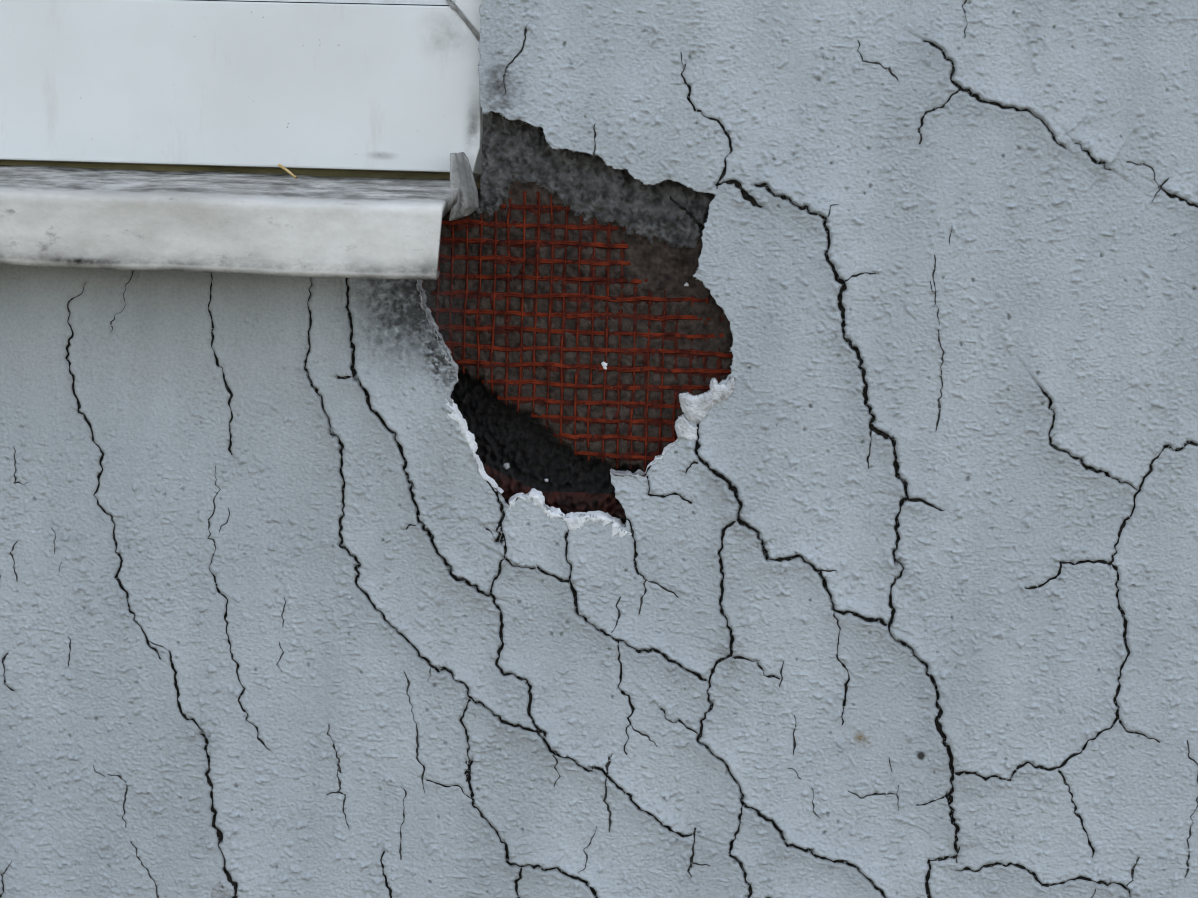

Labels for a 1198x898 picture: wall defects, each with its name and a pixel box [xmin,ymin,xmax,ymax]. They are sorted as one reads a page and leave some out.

crack [503,25,527,96]
crack [857,40,898,81]
crack [918,0,1198,208]
crack [110,270,134,332]
flaking render [416,112,735,538]
crack [13,447,28,485]
crack [208,274,270,750]
crack [304,53,1198,898]
crack [0,541,18,582]
crack [65,283,238,898]
crack [2,653,14,691]
crack [276,597,286,672]